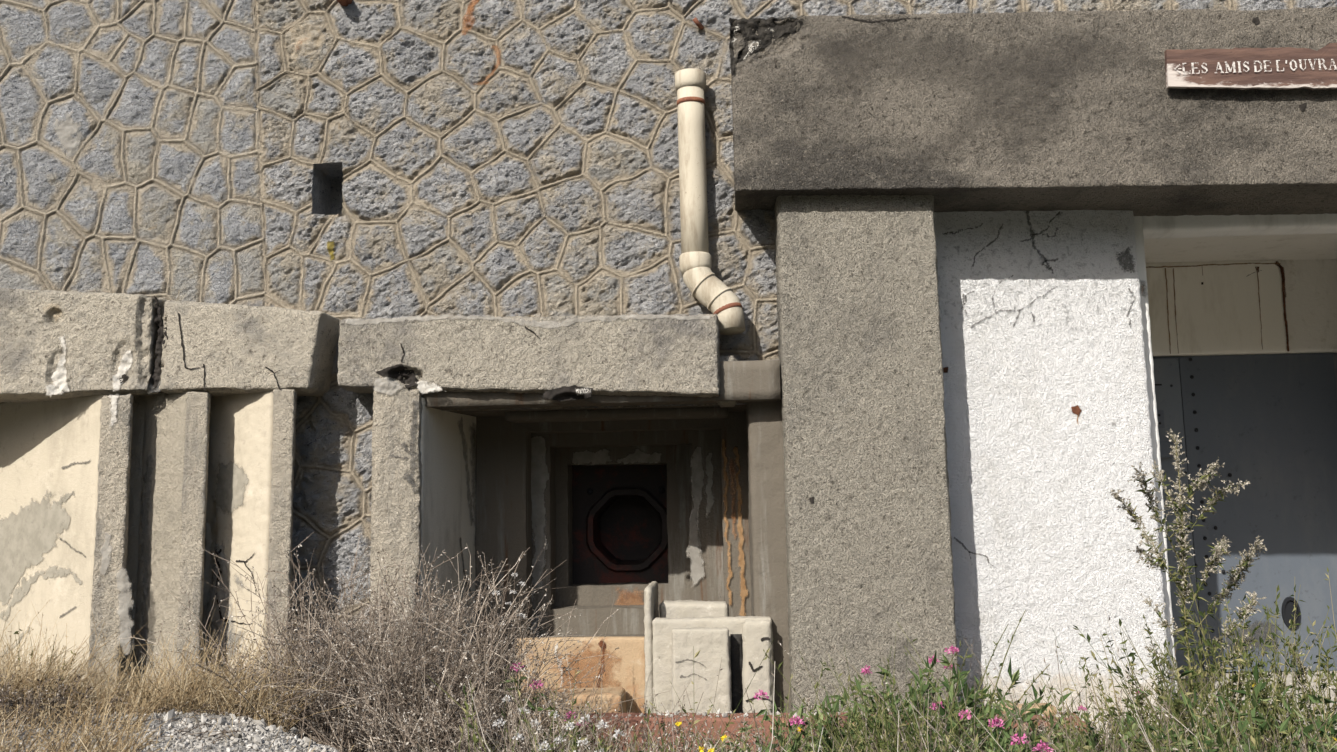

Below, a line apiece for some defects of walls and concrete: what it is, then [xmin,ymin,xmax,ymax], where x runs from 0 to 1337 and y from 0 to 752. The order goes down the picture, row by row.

spalling [729,17,803,76]
crack [178,313,206,391]
spalling [374,364,442,492]
leakage [0,491,82,621]
leakage [100,533,133,654]